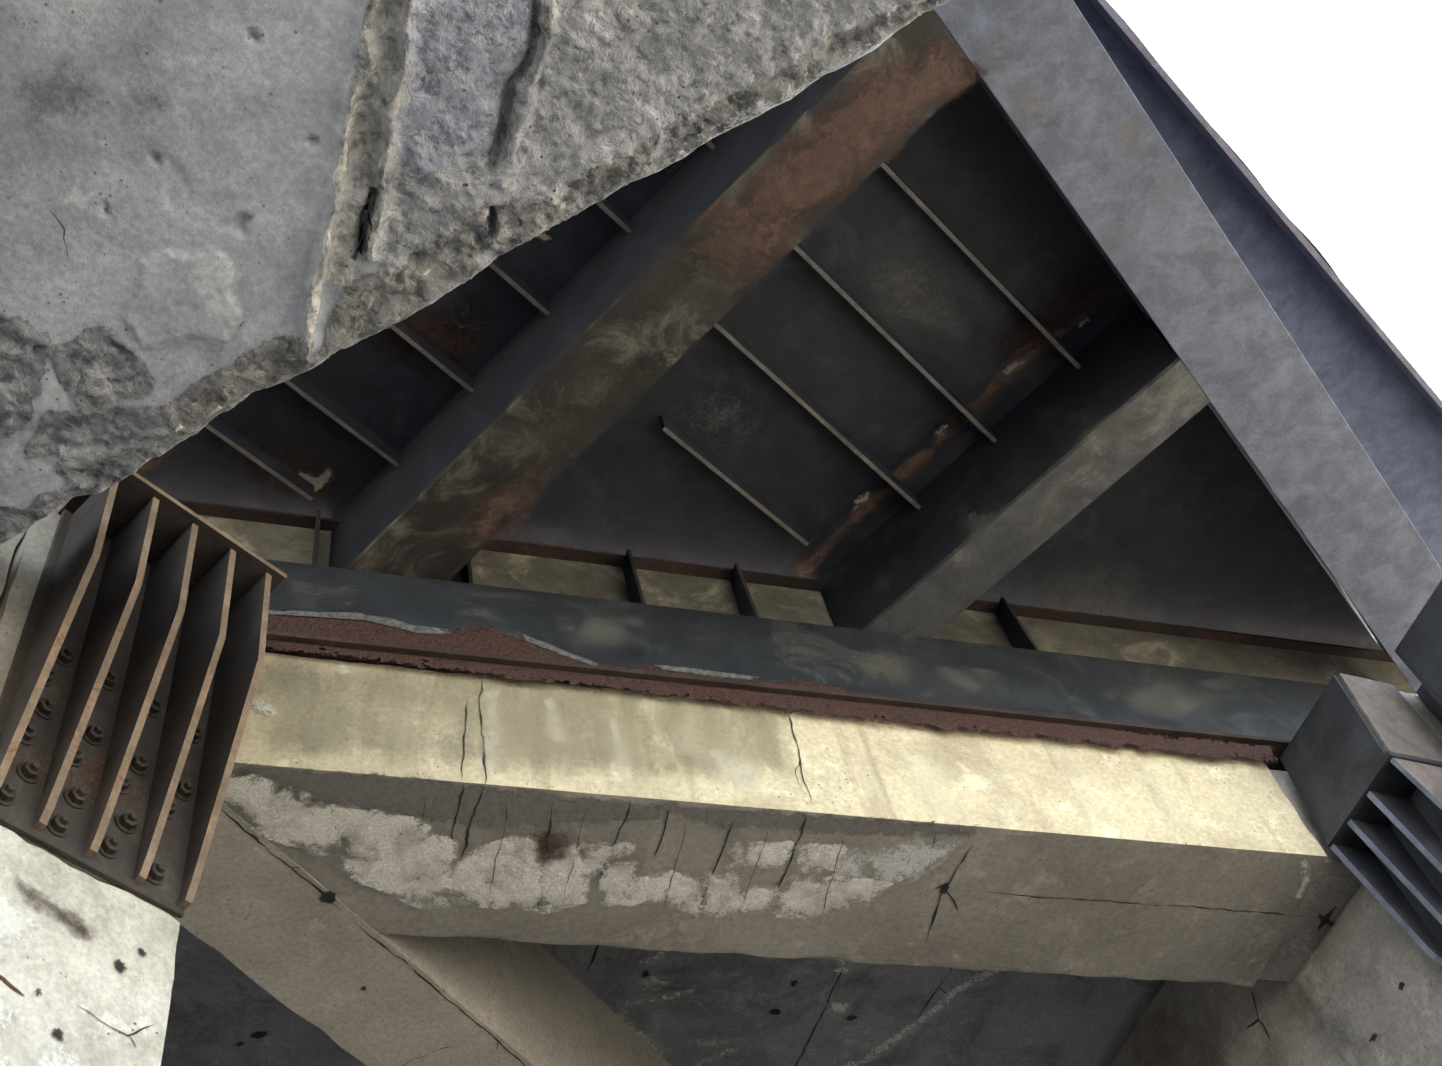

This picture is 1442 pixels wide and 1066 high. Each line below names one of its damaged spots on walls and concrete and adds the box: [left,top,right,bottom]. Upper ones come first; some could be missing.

rust [693,43,986,279]
spalling [0,0,951,543]
rust [249,440,354,496]
rust [462,472,537,541]
rust [266,609,1278,765]
crack [451,681,487,862]
damp [223,766,977,920]
crack [596,801,631,887]
crack [654,808,670,857]
crack [698,818,735,915]
crack [765,715,811,913]
crack [926,836,1318,942]